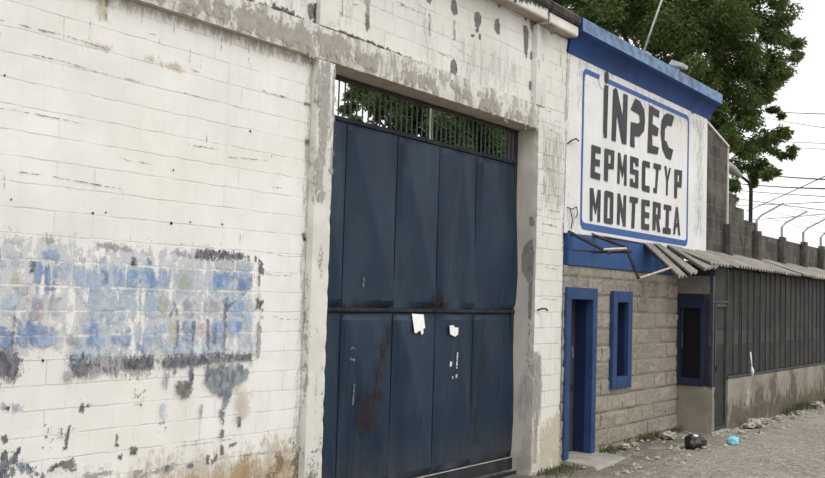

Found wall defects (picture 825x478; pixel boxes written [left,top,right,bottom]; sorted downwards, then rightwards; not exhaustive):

spalling [471,11,481,40]
spalling [523,20,536,60]
peeling [183,0,379,204]
peeling [404,67,437,92]
peeling [450,58,539,132]
peeling [0,225,265,465]
damp [526,324,560,470]
peeling [0,434,113,478]
peeling [132,462,177,478]